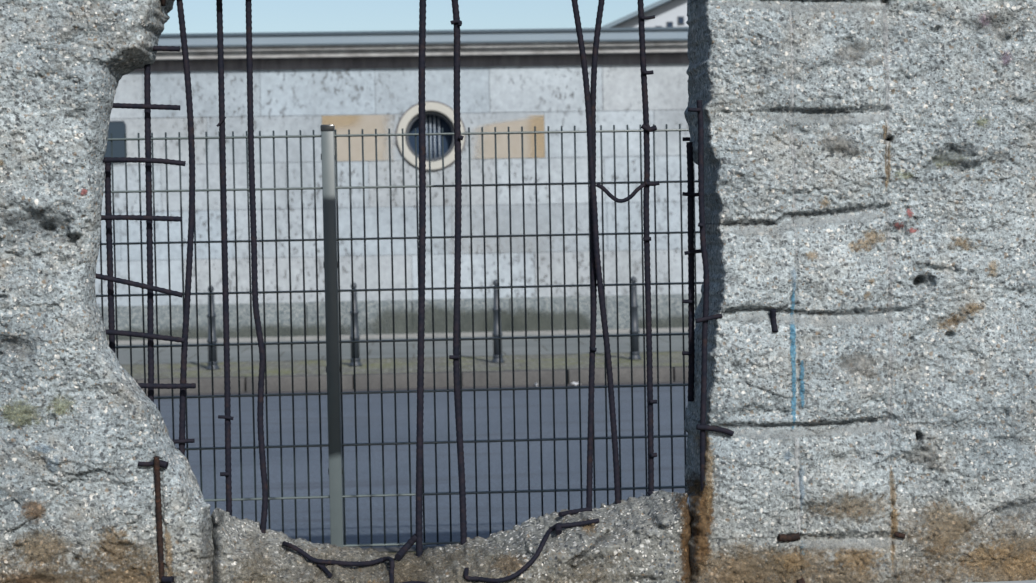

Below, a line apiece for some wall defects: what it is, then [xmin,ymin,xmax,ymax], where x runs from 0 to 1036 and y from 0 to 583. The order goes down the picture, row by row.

corrosion [0,502,173,583]
spalling [95,0,196,456]
spalling [138,456,174,583]
spalling [216,0,234,516]
spalling [245,0,268,534]
spalling [282,0,426,583]
spalling [449,0,467,545]
spalling [463,0,621,583]
spalling [637,0,660,496]
spalling [682,100,734,493]
corrosion [676,432,1036,583]